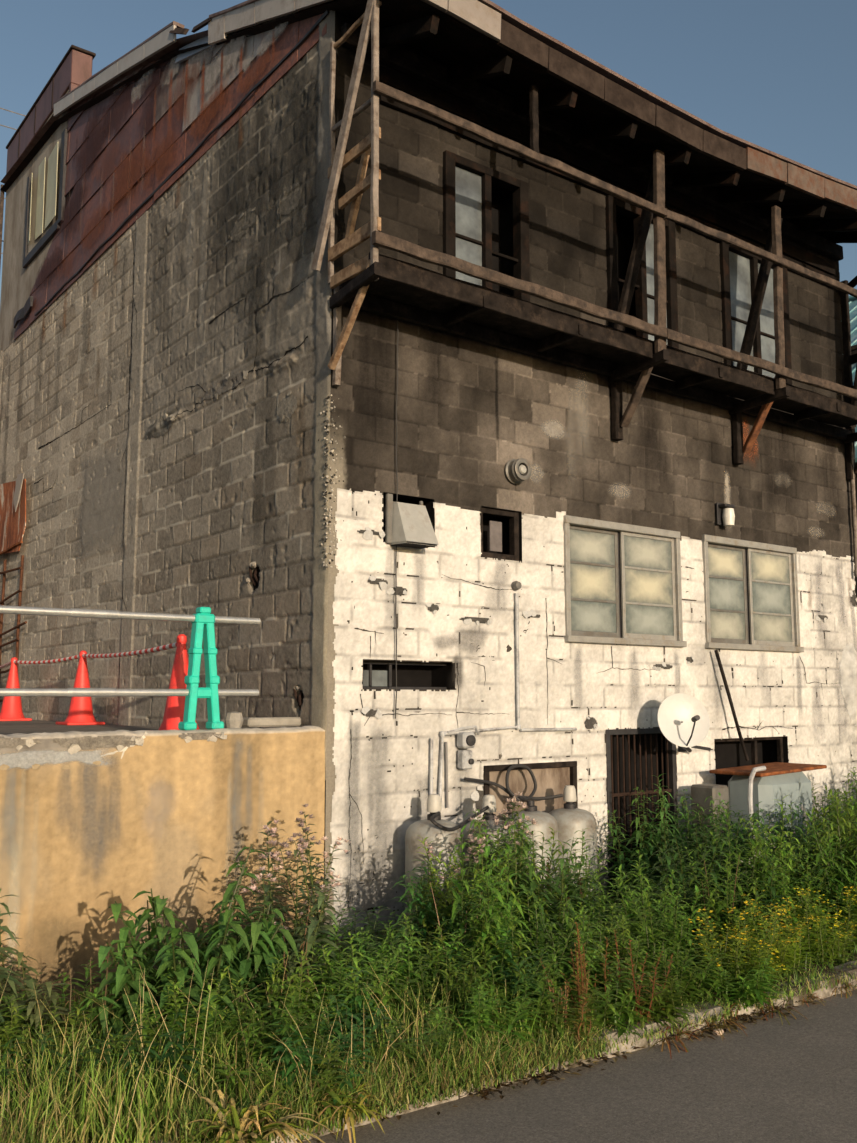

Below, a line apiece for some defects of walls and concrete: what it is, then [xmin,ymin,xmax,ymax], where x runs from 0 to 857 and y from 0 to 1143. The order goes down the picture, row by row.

peeling [132,22,287,102]
rust [110,50,224,211]
crack [444,575,513,590]
crack [354,628,384,654]
crack [545,598,561,718]
peeling [0,735,144,770]
spalling [179,730,227,743]
crack [722,722,793,732]
crack [348,662,505,890]